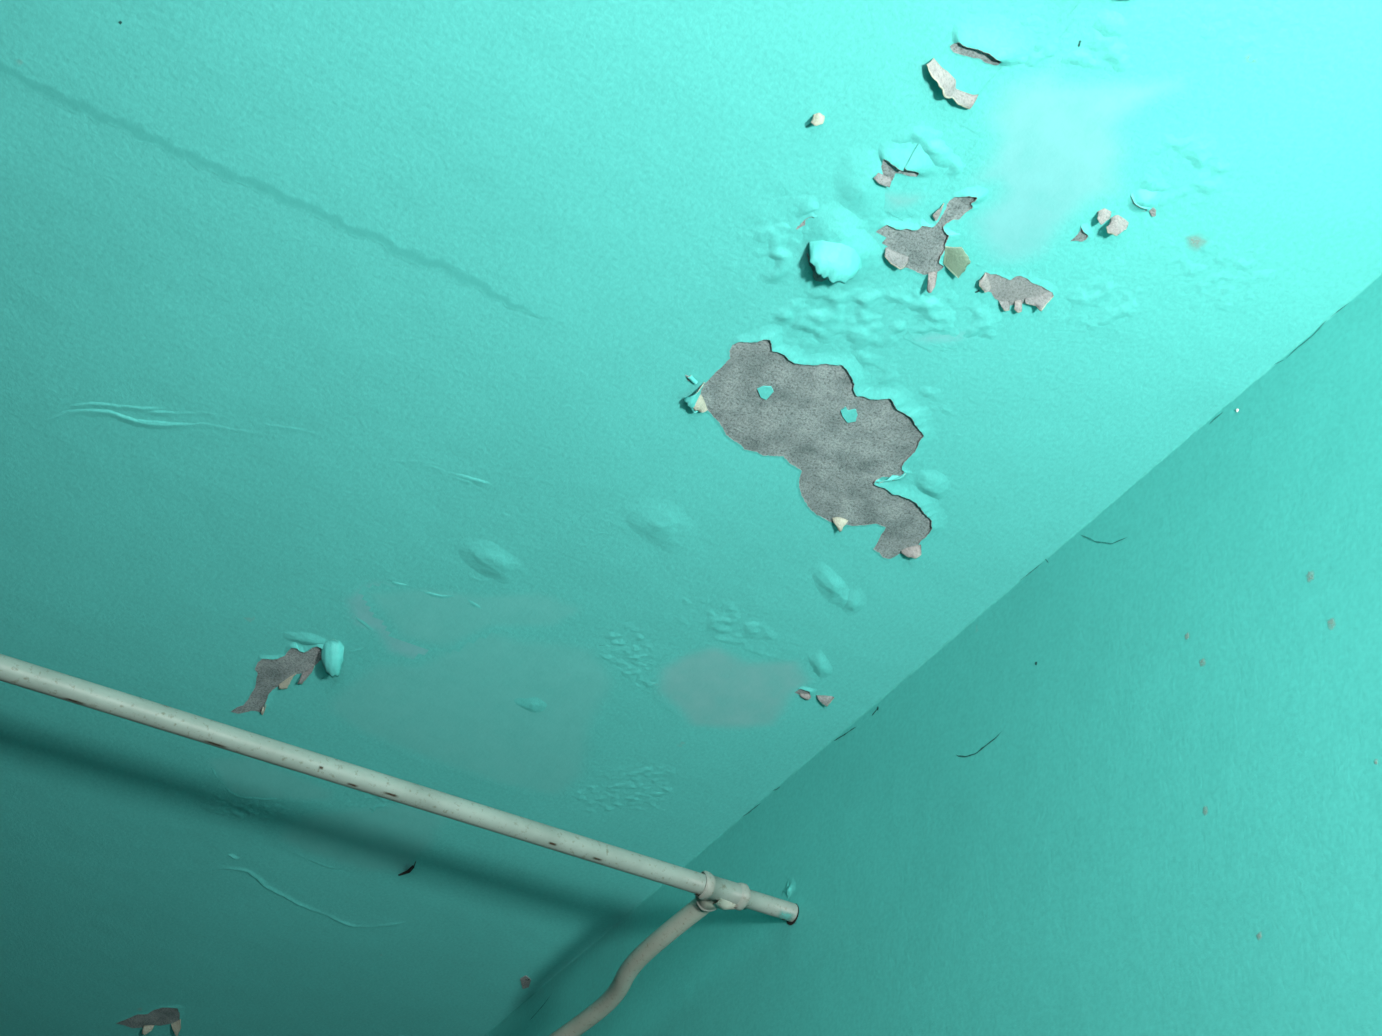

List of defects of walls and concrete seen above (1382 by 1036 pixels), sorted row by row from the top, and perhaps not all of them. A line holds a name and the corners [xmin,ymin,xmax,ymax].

peeling [796,3,1208,313]
peeling [684,325,948,560]
peeling [229,632,344,715]
peeling [115,1004,186,1036]